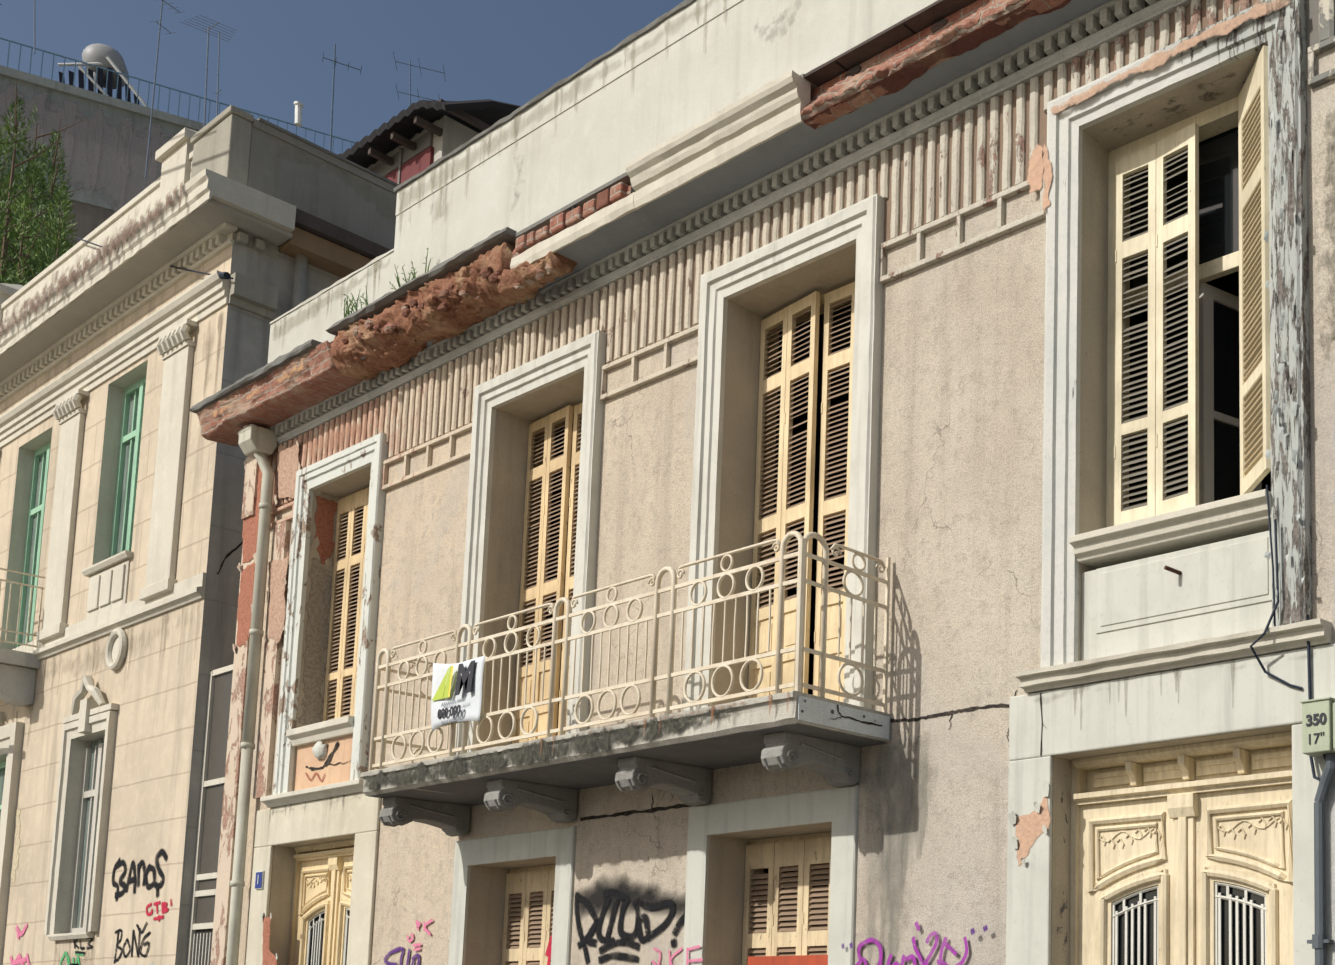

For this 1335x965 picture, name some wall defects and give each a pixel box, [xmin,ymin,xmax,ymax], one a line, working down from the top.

peeling [1264,0,1301,466]
flaking render [1320,110,1335,357]
flaking render [233,440,300,653]
flaking render [298,490,342,724]
crack [833,690,1044,756]